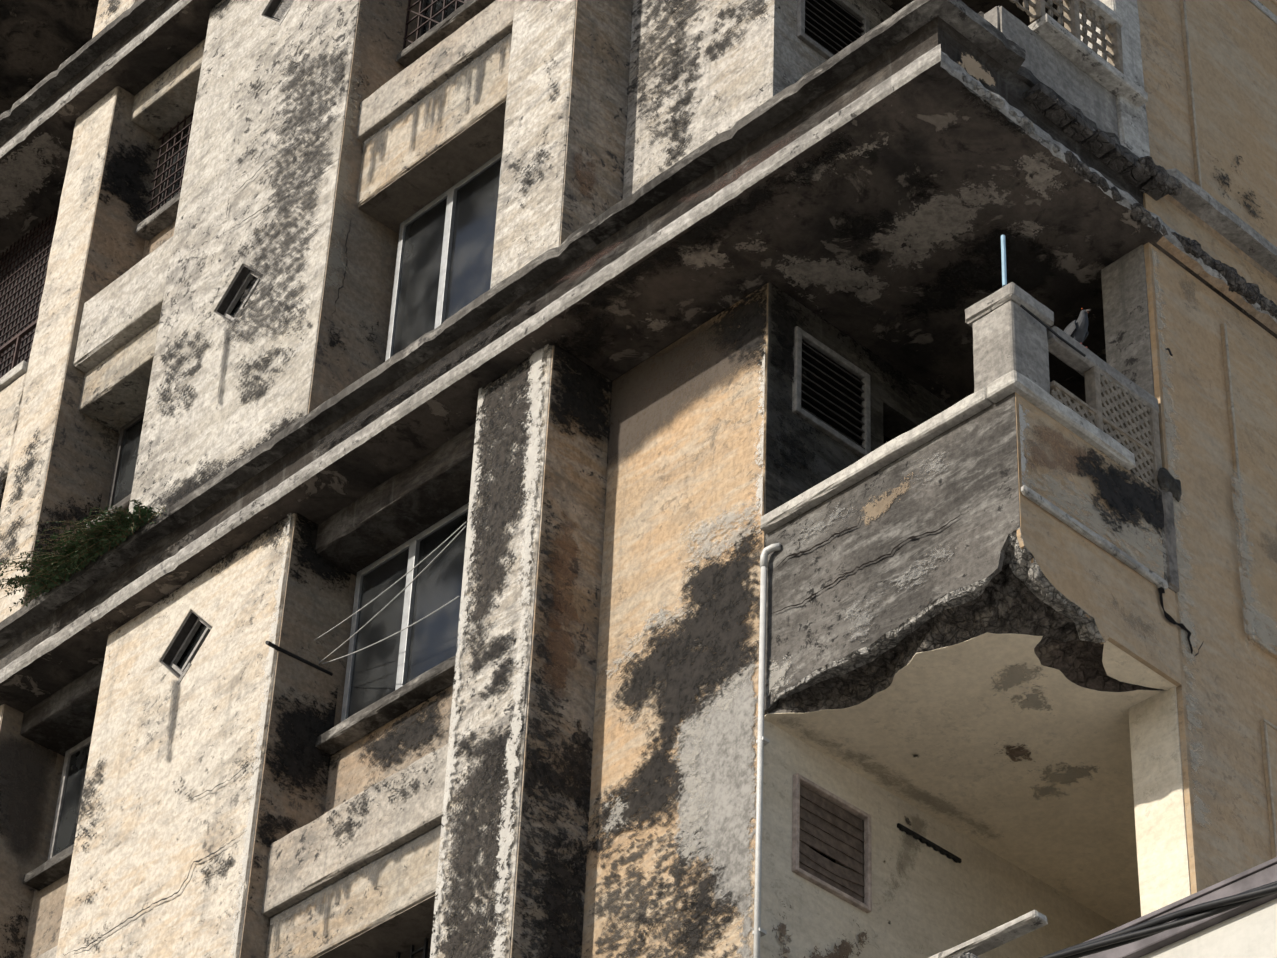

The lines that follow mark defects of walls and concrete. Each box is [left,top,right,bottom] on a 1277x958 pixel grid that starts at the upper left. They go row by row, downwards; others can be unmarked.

damp [151,38,370,429]
damp [509,116,553,207]
peeling [677,52,1277,319]
damp [195,847,236,891]
damp [239,687,341,906]
damp [269,133,852,958]
spalling [669,527,1164,866]
damp [1033,762,1096,800]
mould [1074,446,1164,538]
crack [1158,587,1204,656]